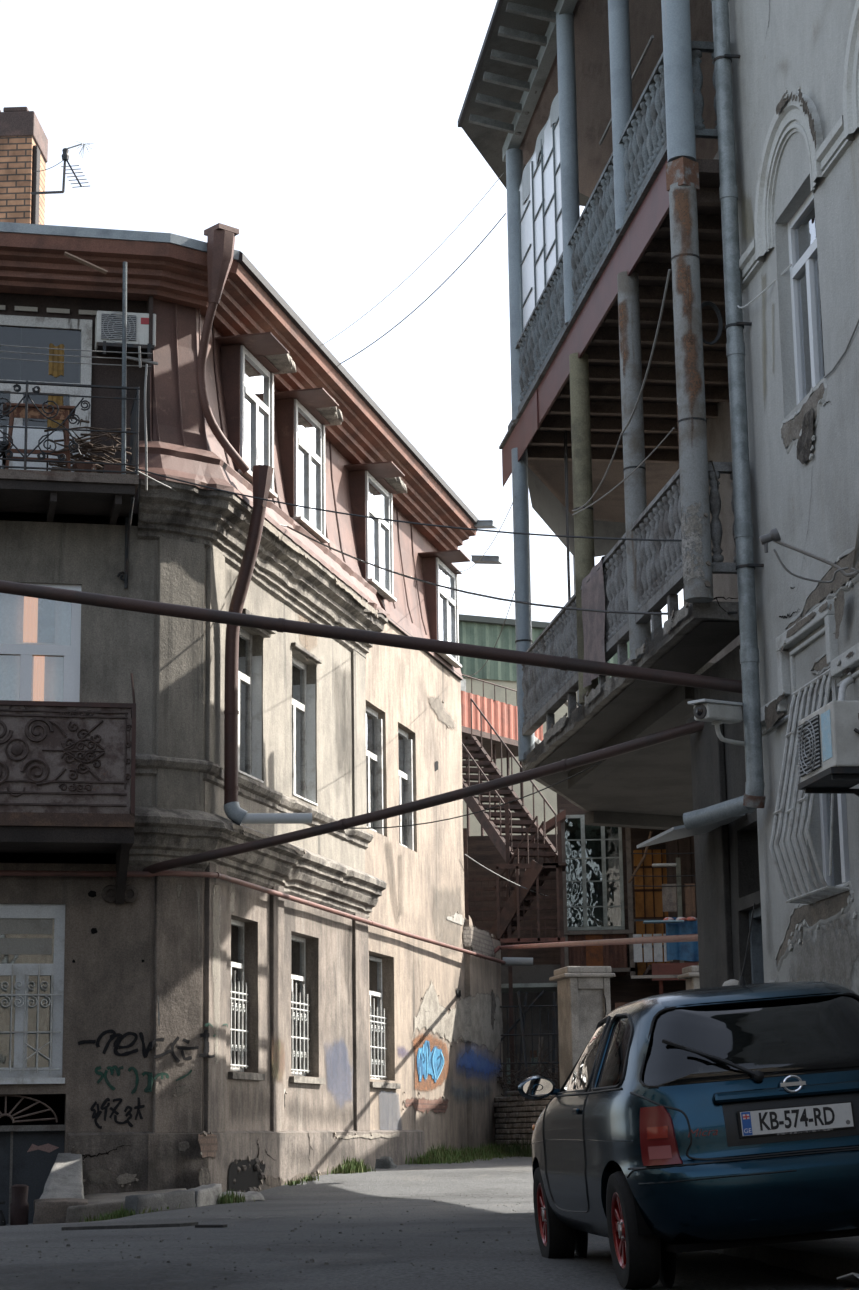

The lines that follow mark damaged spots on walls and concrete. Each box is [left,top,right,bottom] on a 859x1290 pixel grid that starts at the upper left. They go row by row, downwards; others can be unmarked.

corrosion [673,189,702,450]
spalling [780,378,828,465]
flaking render [778,547,859,653]
flaking render [810,651,853,676]
flaking render [768,881,857,983]
peeling [413,981,503,1053]